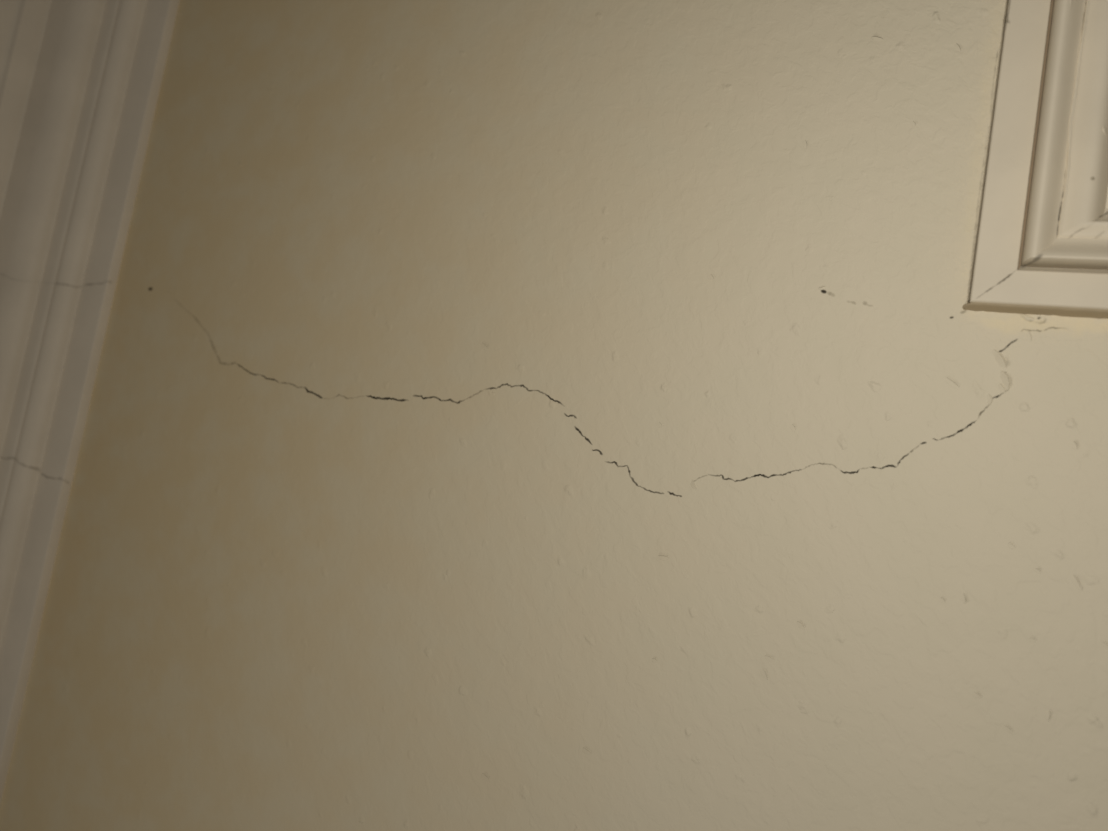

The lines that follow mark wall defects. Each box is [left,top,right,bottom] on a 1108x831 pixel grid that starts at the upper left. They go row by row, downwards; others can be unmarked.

crack [368,395,460,403]
crack [491,383,698,497]
crack [722,472,791,481]
crack [842,331,1033,474]